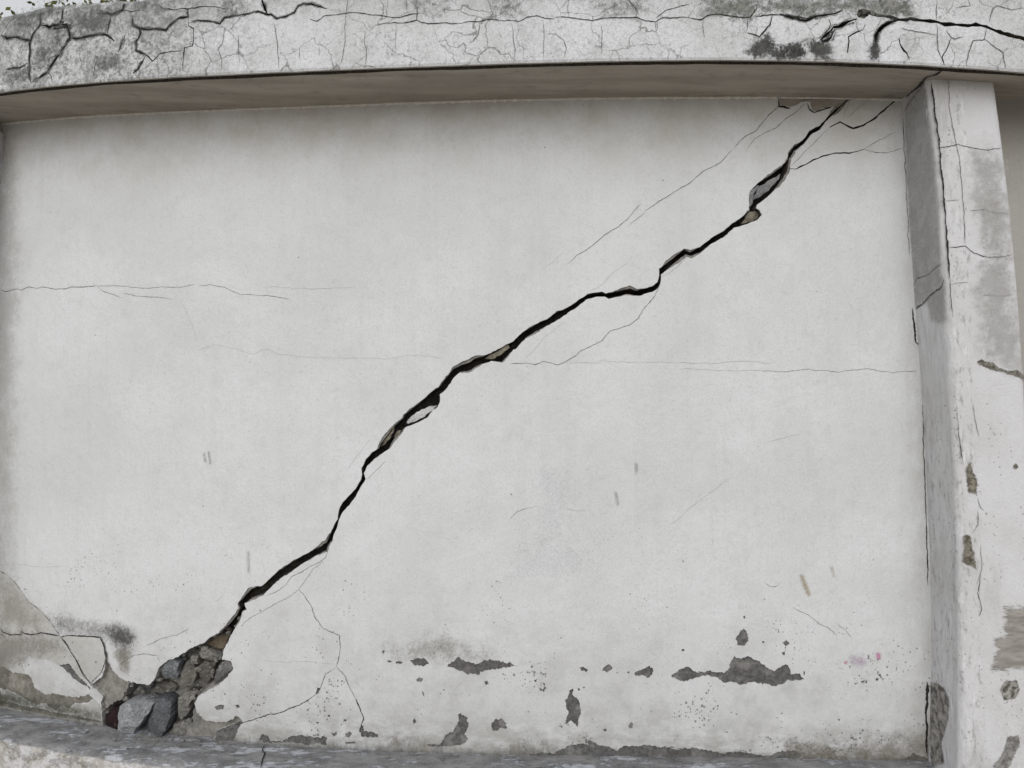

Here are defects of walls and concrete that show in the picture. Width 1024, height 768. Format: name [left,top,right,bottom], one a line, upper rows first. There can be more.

mould [746,34,832,59]
leakage [869,41,880,59]
crack [1,0,1024,344]
crack [219,99,910,731]
crack [921,405,929,582]
spalling [0,627,243,741]
peeling [427,713,469,747]
peeling [448,657,515,685]
peeling [565,687,585,726]
peeling [671,616,805,687]
crack [923,682,931,756]
peeling [992,606,1024,700]